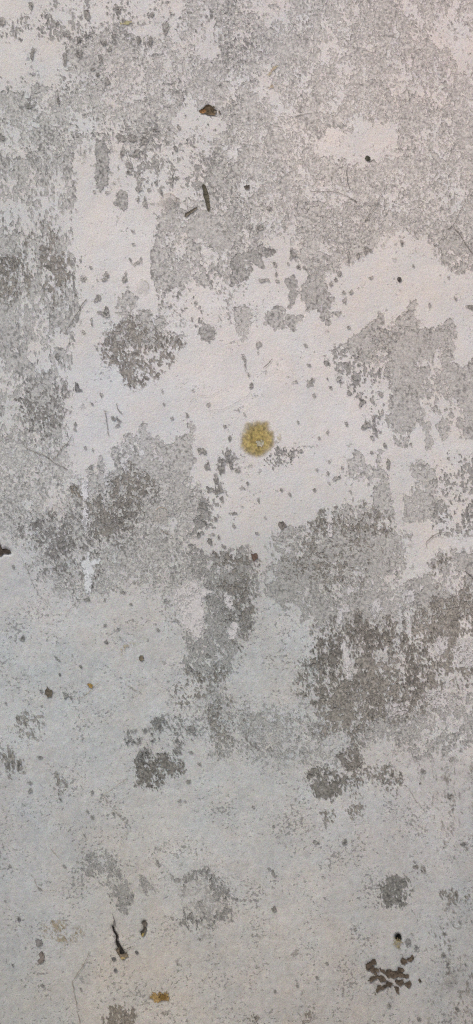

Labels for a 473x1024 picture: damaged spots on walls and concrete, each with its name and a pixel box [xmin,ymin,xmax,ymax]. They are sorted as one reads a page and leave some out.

crack [72,914,138,1022]